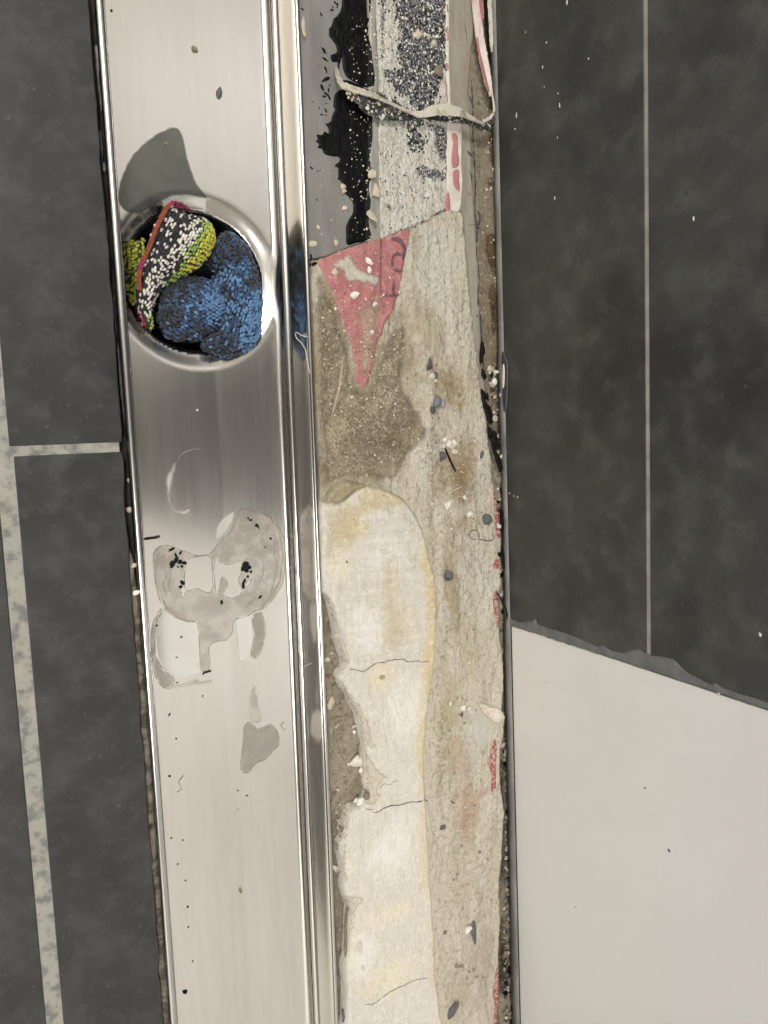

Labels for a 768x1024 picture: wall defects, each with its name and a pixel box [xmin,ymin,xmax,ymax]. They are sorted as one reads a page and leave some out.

peeling [413,30,436,47]
peeling [484,0,493,63]
peeling [312,47,496,132]
peeling [368,169,381,197]
damp [247,511,284,658]
crack [347,659,429,672]
damp [242,722,284,772]
crack [366,780,428,813]